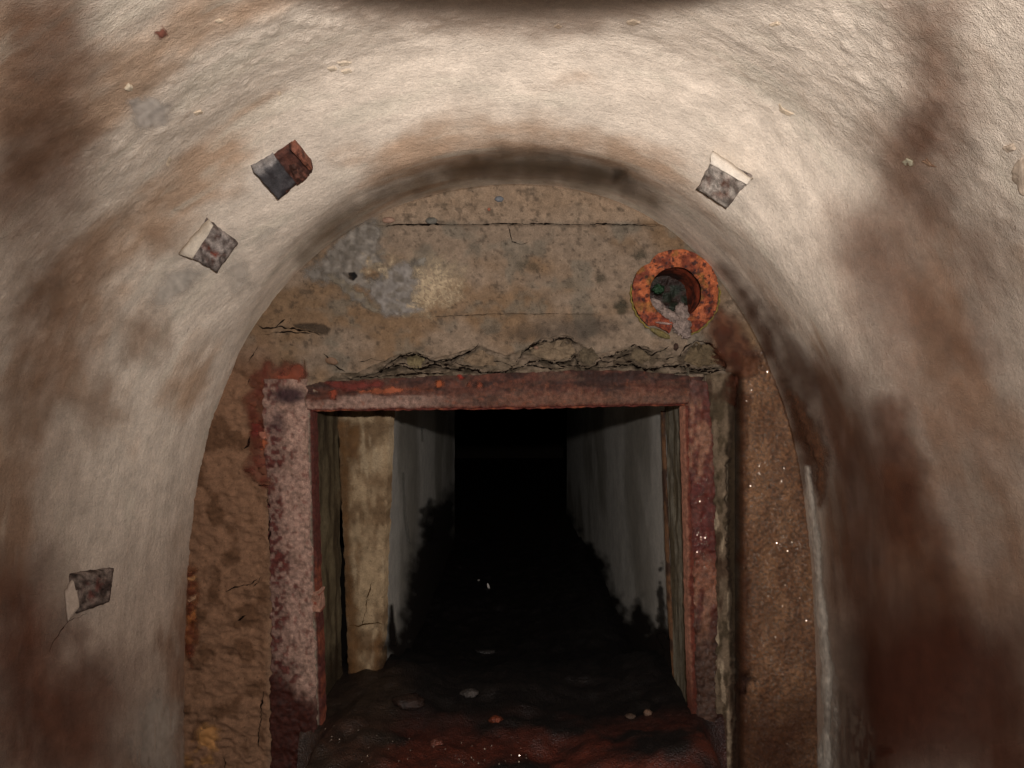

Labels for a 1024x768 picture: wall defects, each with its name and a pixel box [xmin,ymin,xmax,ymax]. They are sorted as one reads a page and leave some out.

crack [382,223,662,244]
corrosion [243,362,306,485]
corrosion [325,381,404,399]
crack [247,313,729,385]
damp [738,290,1024,768]
corrosion [346,586,359,673]